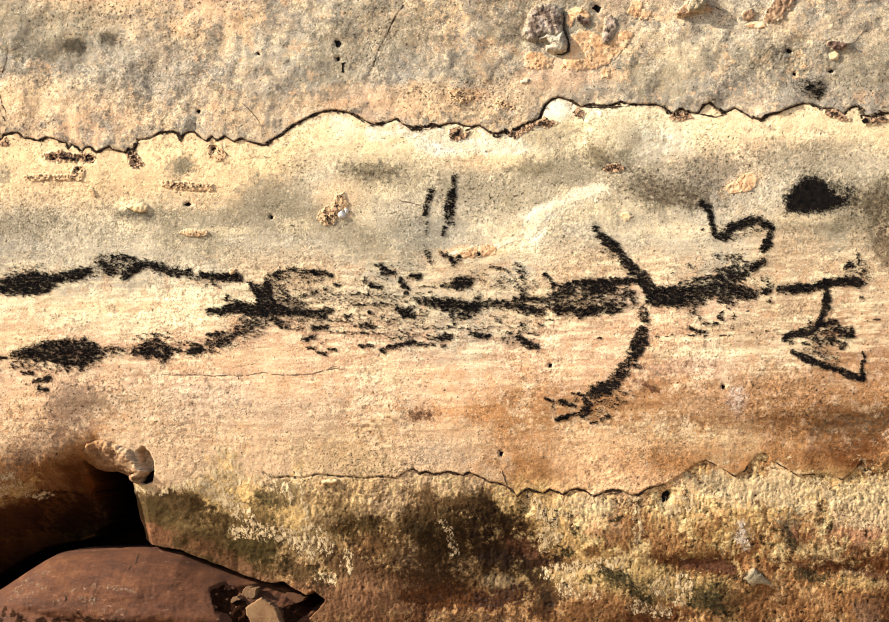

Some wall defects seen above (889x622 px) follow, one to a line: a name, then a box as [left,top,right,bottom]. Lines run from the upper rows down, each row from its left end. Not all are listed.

crack [0,48,889,157]
crack [266,468,665,508]
crack [702,453,818,486]
water stain [734,518,754,551]